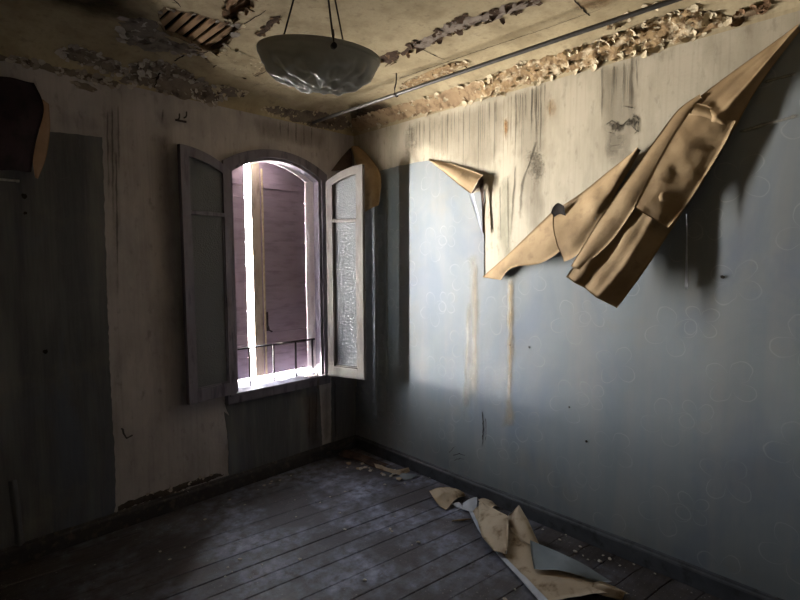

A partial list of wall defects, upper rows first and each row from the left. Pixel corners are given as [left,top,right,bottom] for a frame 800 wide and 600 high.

flaking render [0,0,263,107]
peeling [260,0,771,132]
peeling [116,473,223,512]